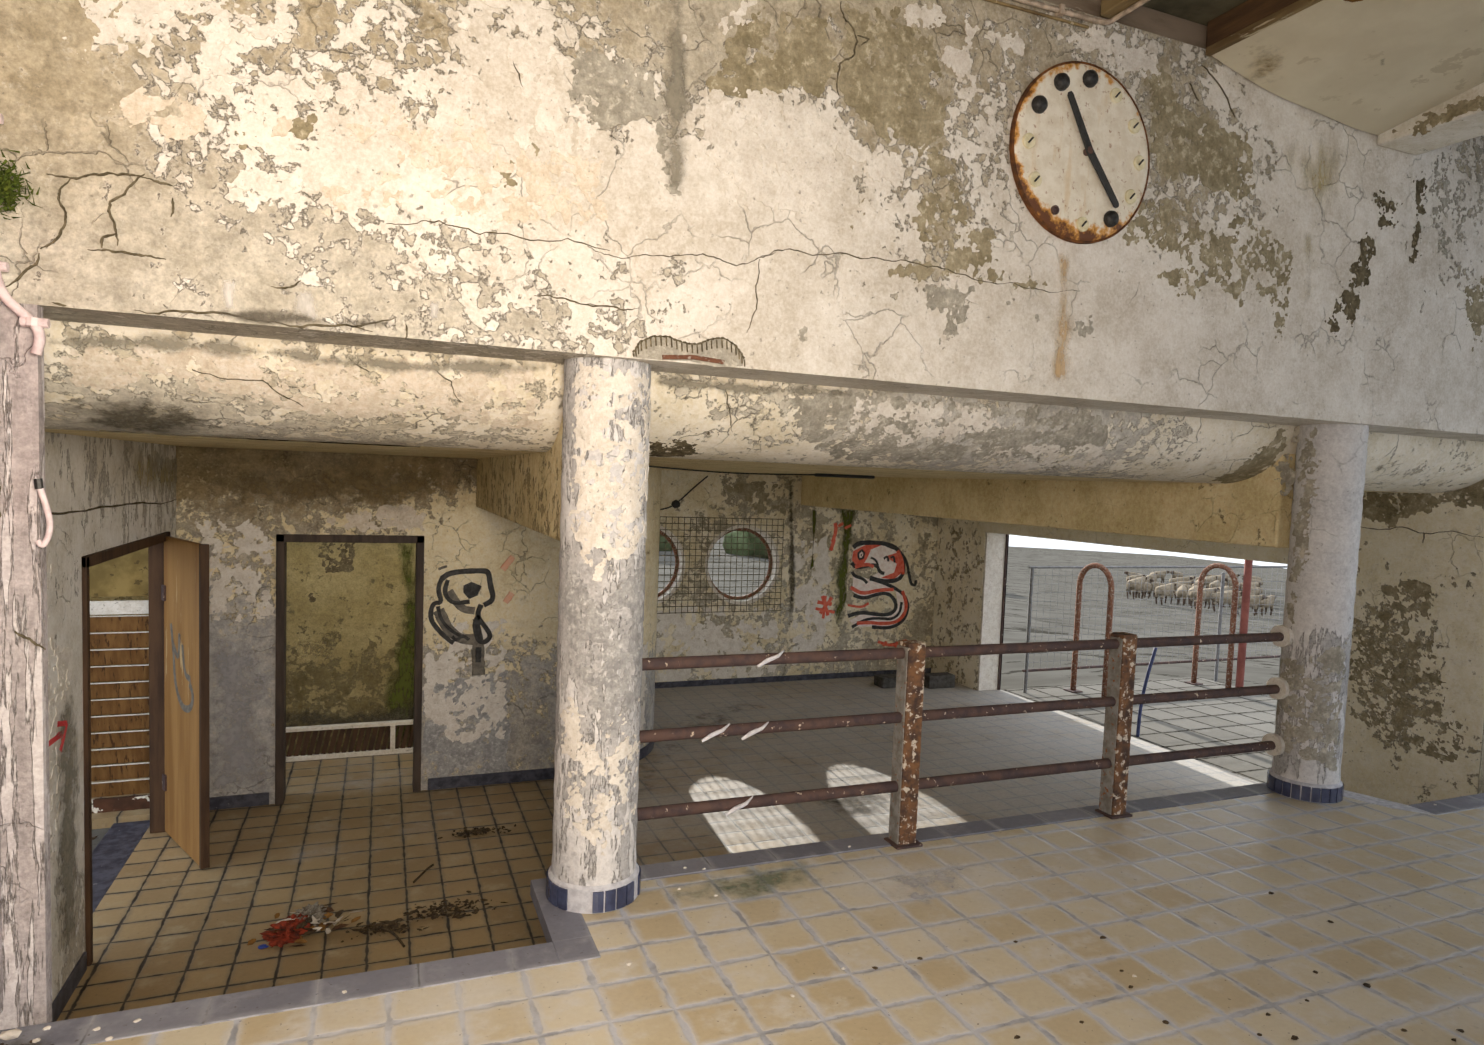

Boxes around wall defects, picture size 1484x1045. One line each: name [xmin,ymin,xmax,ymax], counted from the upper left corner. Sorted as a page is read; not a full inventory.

peeling [62,0,294,91]
leakage [664,29,688,184]
crack [6,172,174,287]
crack [135,280,408,372]
crack [386,220,1076,332]
peeling [702,0,1047,349]
spalling [1051,24,1293,343]
spalling [1324,143,1484,337]
leakage [80,400,203,433]
peeling [61,342,547,435]
crack [52,499,176,515]
peeling [559,335,832,856]